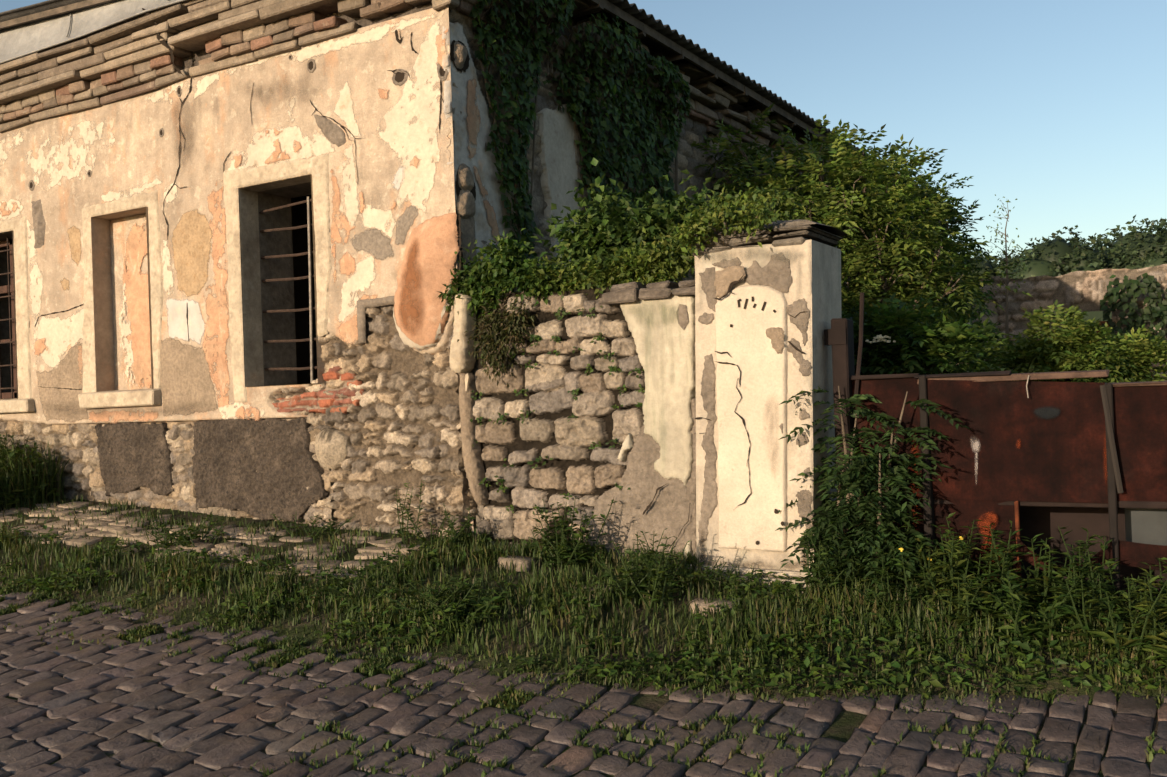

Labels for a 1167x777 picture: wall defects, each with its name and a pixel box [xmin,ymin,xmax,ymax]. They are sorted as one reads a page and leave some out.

crack [142,8,191,240]
spalling [0,13,527,538]
peeling [536,103,591,267]
peeling [586,252,813,563]
crack [695,351,751,506]
corrosion [978,513,1000,583]